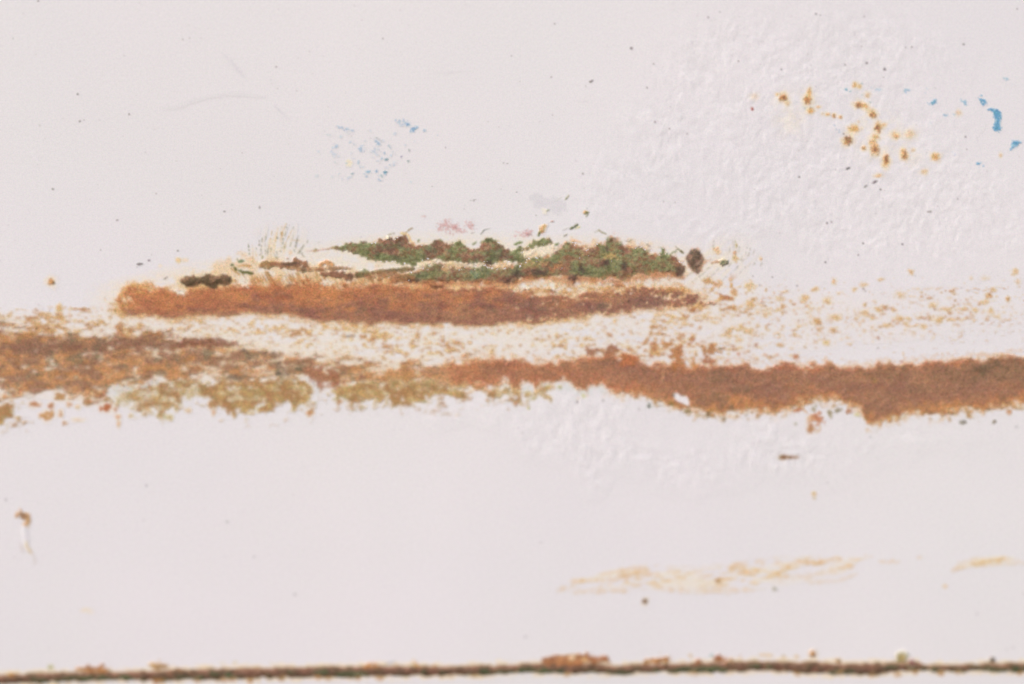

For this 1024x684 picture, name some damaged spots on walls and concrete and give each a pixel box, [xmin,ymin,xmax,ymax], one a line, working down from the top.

corrosion [747,80,945,179]
corrosion [0,228,1024,437]
corrosion [74,662,109,676]
corrosion [540,650,610,678]
corrosion [642,654,673,665]